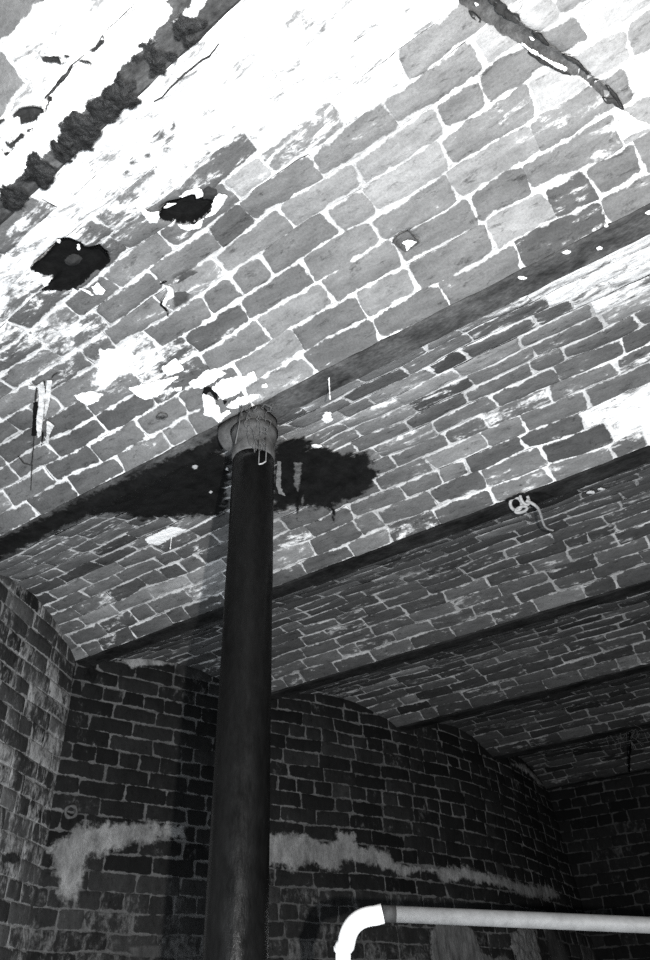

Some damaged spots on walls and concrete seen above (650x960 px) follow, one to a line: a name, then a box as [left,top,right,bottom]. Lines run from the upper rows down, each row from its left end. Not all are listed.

spalling [41,35,104,84]
corrosion [130,14,208,79]
spalling [0,96,52,160]
corrosion [0,72,142,212]
spalling [141,186,228,231]
spalling [30,237,110,296]
peeling [74,391,103,406]
peeling [129,359,267,409]
leakage [274,437,380,521]